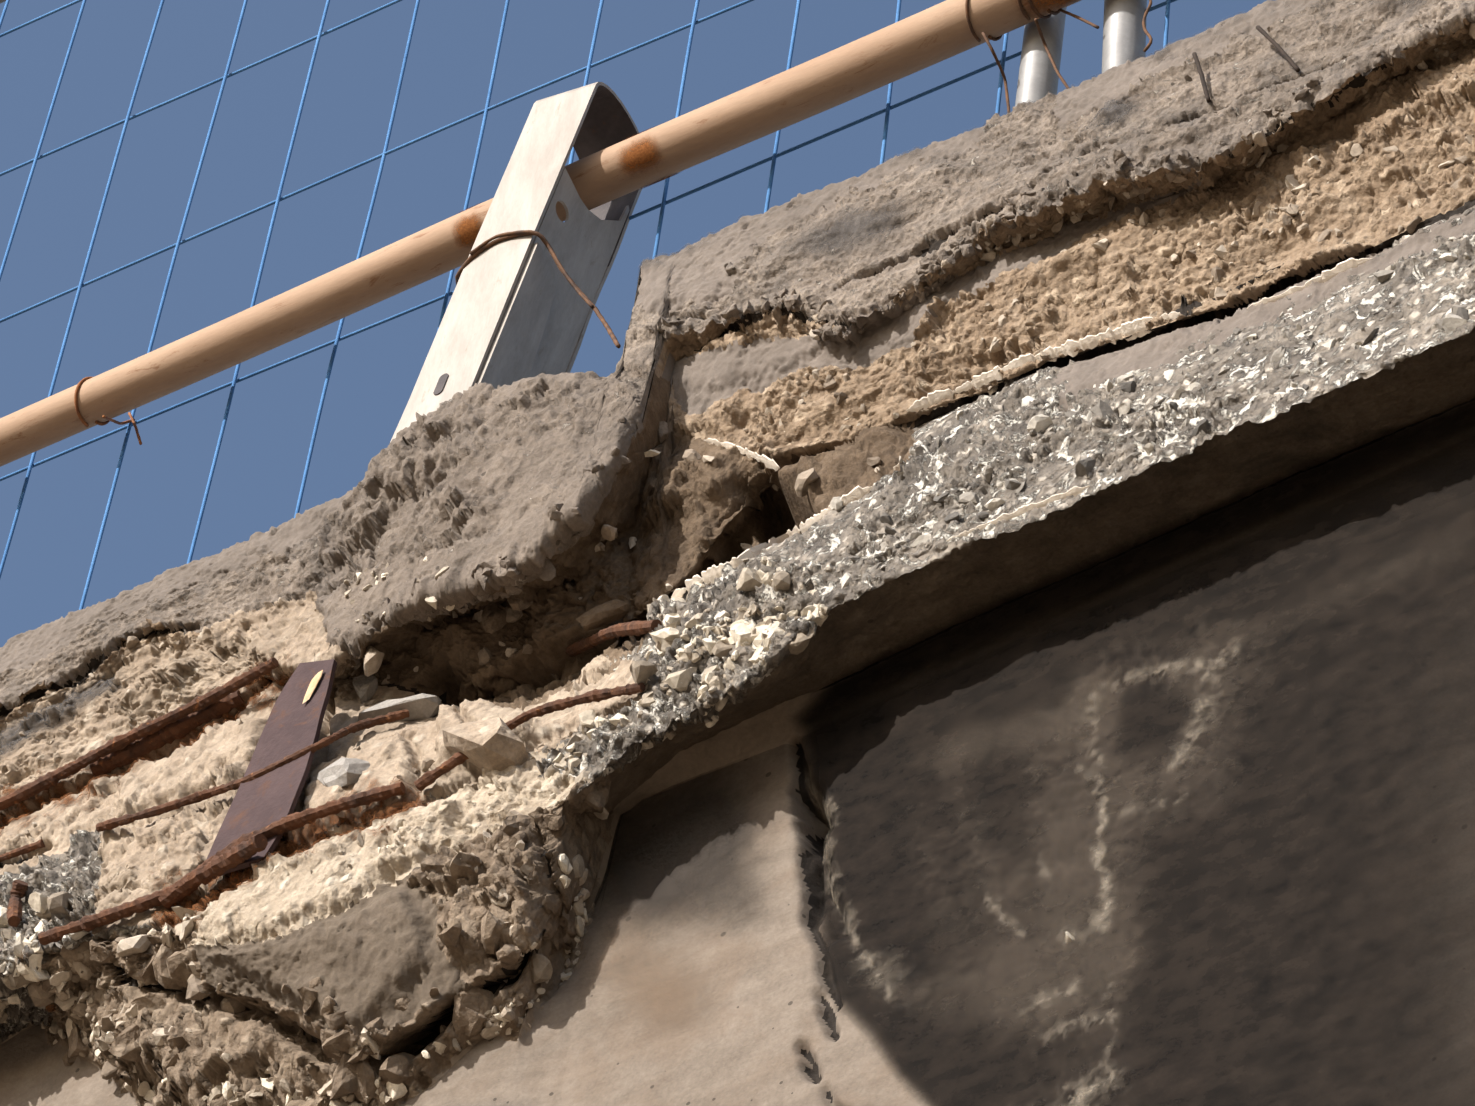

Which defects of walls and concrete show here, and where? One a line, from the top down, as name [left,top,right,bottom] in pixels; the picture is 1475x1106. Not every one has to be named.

crack [1019,357,1067,378]
spalling [669,18,1475,609]
crack [1185,243,1363,322]
crack [0,627,182,718]
corrosion [0,657,288,831]
corrosion [96,709,410,832]
spalling [0,306,917,1046]
corrosion [505,682,645,730]
corrosion [38,752,469,945]
crack [795,742,843,1103]
damp [1094,849,1111,929]
damp [1072,1074,1114,1104]